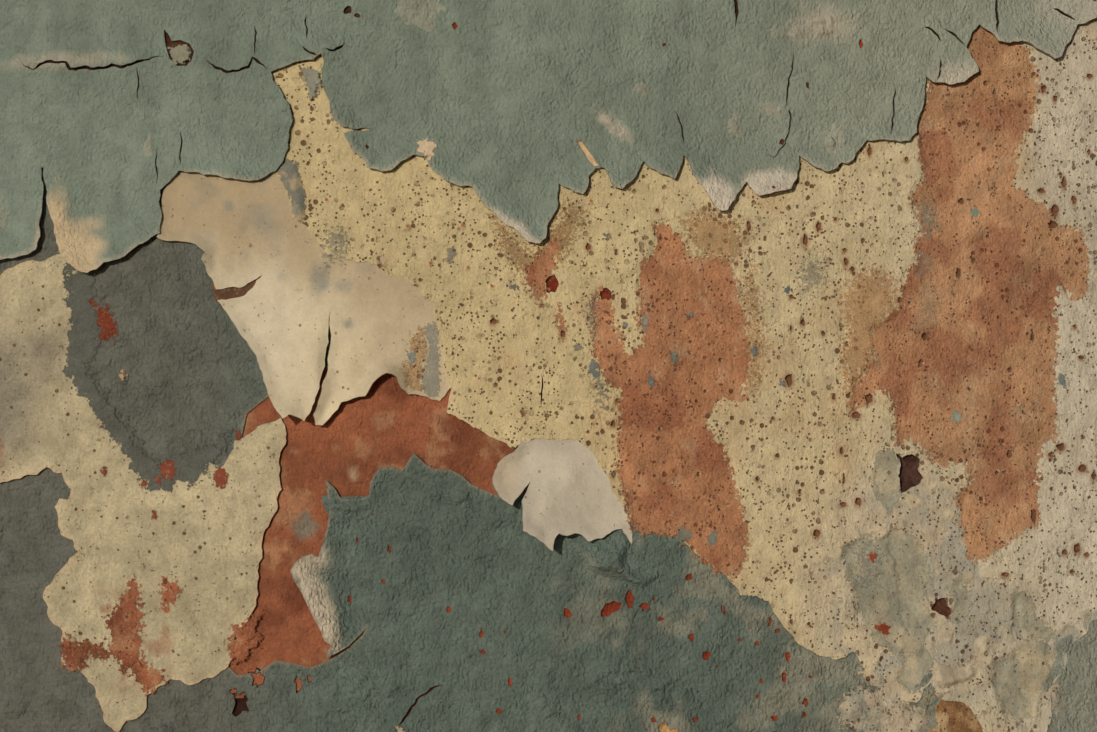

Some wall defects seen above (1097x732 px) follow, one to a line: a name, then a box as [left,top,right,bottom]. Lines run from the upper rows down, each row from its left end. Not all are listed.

crack [26,57,154,100]
peeling [164,30,195,66]
crack [732,0,740,26]
peeling [232,0,1097,565]
flaking render [0,74,753,732]
peeling [840,526,983,732]
peeling [992,589,1058,721]